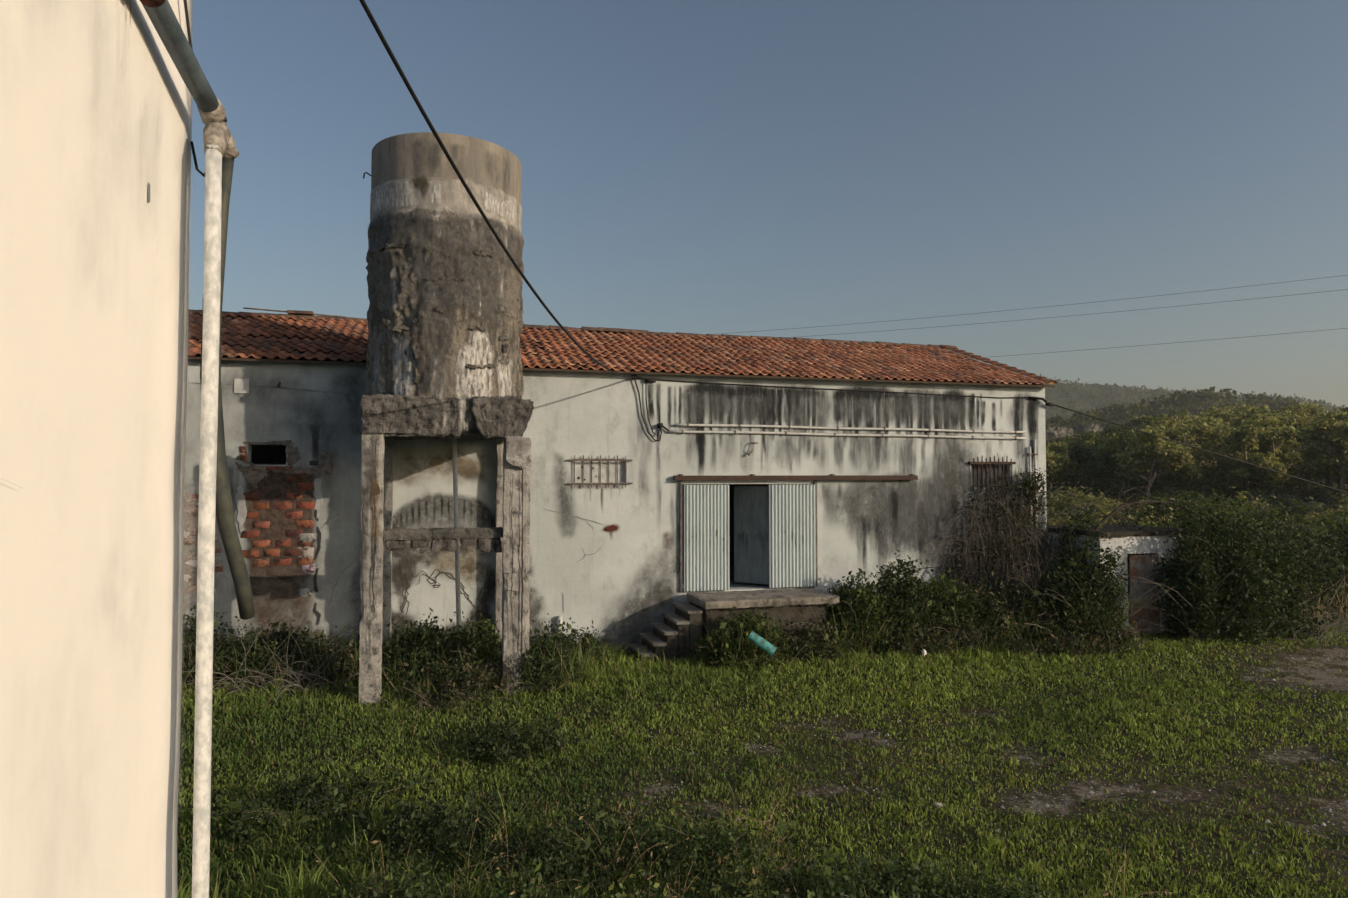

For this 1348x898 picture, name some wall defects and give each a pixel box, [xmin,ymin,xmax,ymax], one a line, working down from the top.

peeling [374,192,515,399]
spalling [235,440,333,642]
leakage [558,459,573,534]
leakage [529,558,677,649]
leakage [648,383,1044,602]